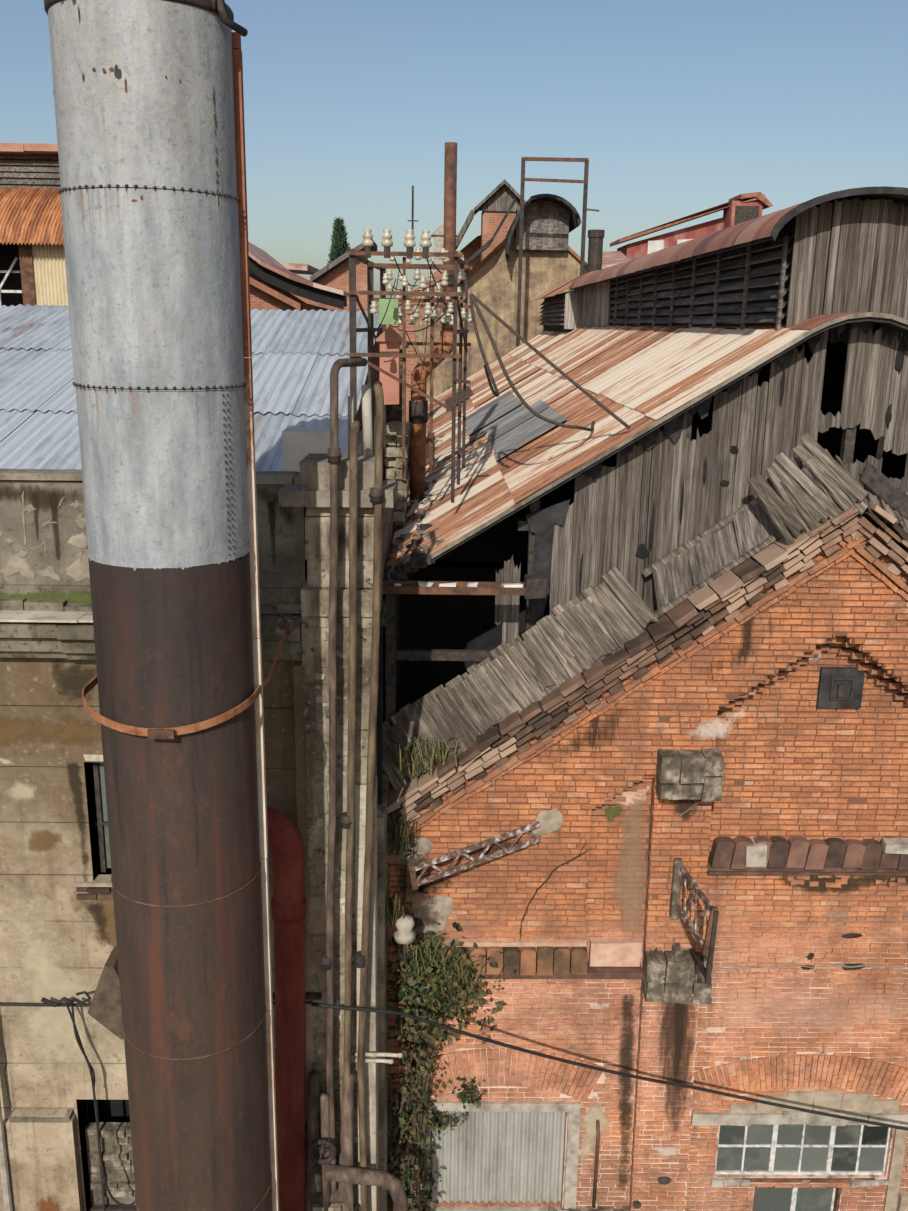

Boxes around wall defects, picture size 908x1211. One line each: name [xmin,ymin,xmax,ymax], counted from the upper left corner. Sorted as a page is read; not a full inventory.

peeling [0,500,90,581]
leakage [26,763,88,880]
crack [520,840,589,939]
leakage [661,1003,694,1127]
rust [40,1197,59,1211]